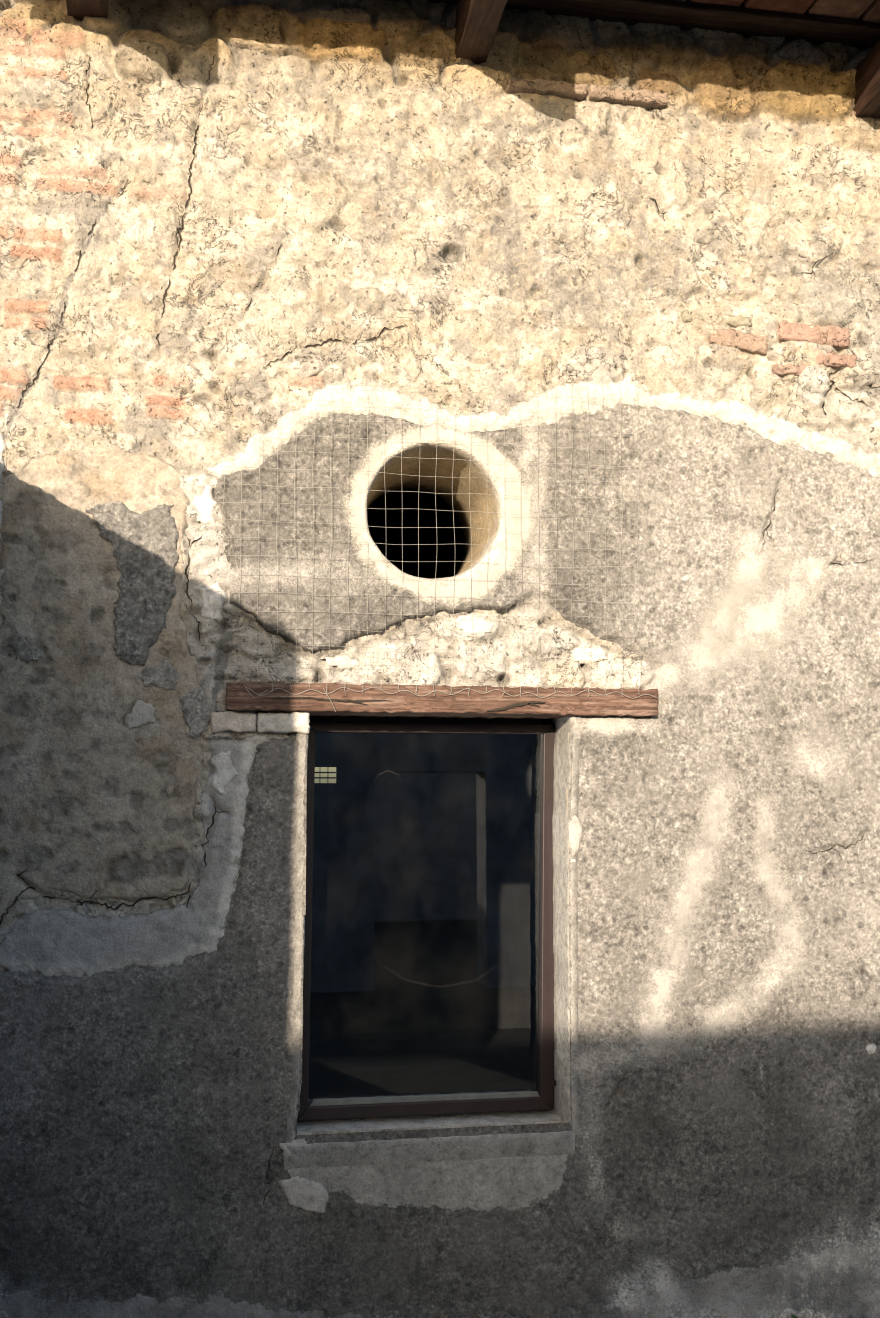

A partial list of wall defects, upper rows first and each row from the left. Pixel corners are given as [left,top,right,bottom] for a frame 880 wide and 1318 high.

crack [85,56,93,129]
crack [156,55,216,353]
crack [2,181,128,434]
crack [263,324,408,368]
crack [822,352,880,415]
leakage [644,526,828,693]
spalling [0,445,654,920]
leakage [571,715,657,737]
leakage [786,731,848,781]
crack [0,796,229,925]
leakage [570,769,808,1202]
leakage [566,1260,789,1318]